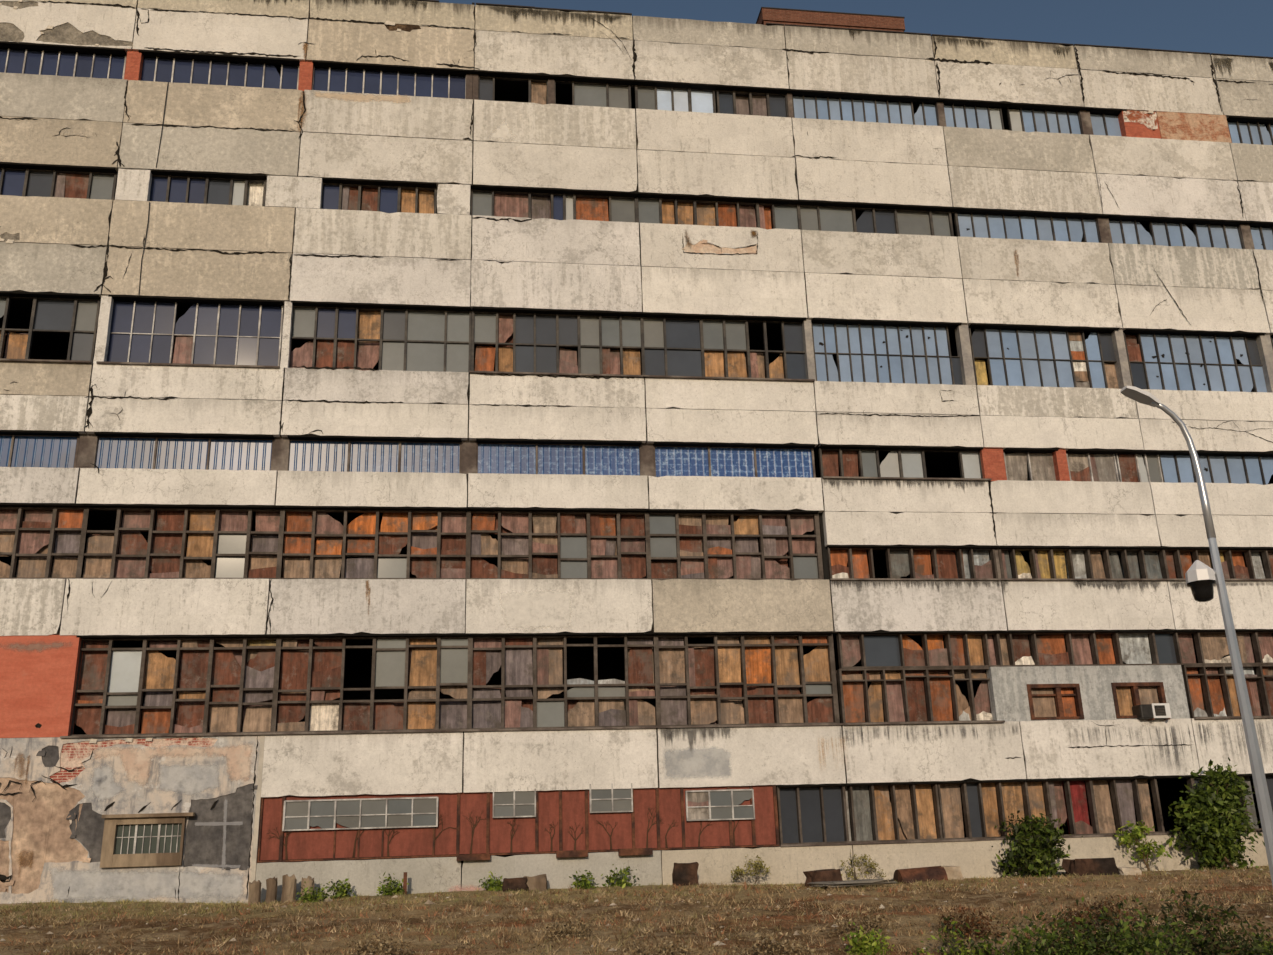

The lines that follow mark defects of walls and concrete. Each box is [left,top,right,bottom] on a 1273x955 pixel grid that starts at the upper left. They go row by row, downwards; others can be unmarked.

spalling [0,0,38,9]
spalling [0,23,133,47]
crack [926,38,1257,111]
peeling [1123,110,1158,130]
crack [1150,267,1191,325]
flaking render [0,737,218,894]
flaking render [183,783,258,870]